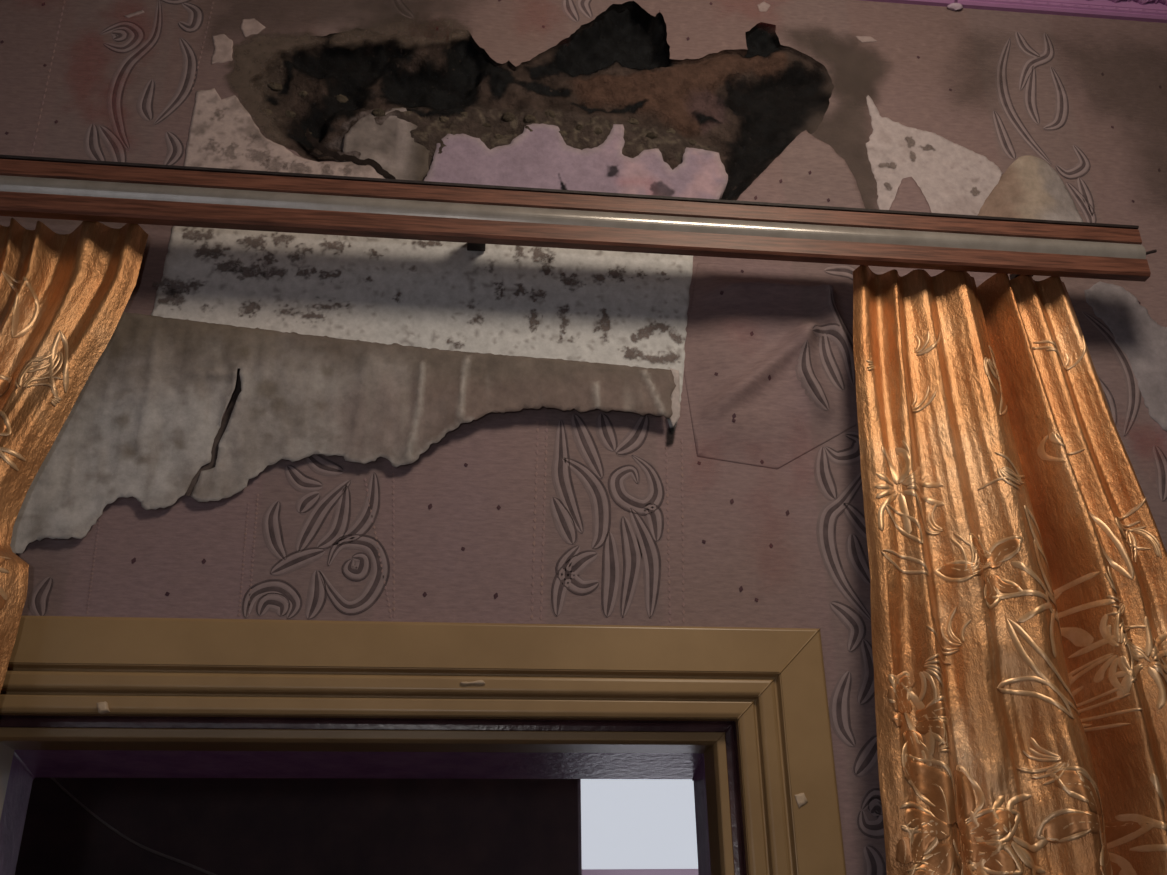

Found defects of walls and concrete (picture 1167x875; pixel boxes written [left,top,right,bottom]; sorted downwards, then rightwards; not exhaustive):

spalling [184,1,834,200]
flaking render [866,95,1083,222]
peeling [10,226,693,554]
flaking render [1084,281,1167,431]